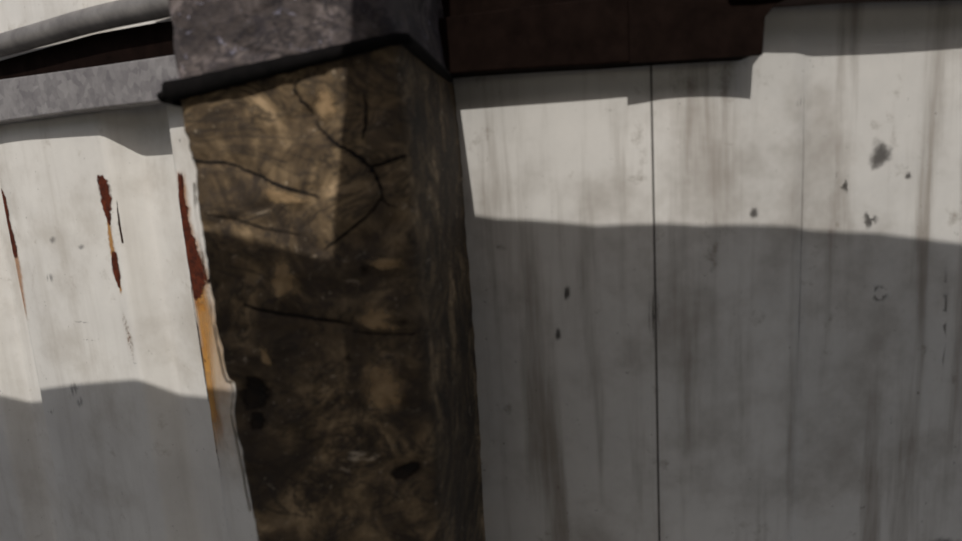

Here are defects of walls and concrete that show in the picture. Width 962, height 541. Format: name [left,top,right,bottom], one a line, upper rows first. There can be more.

rust [1,189,25,309]
rust [97,175,122,292]
rust [178,173,220,432]